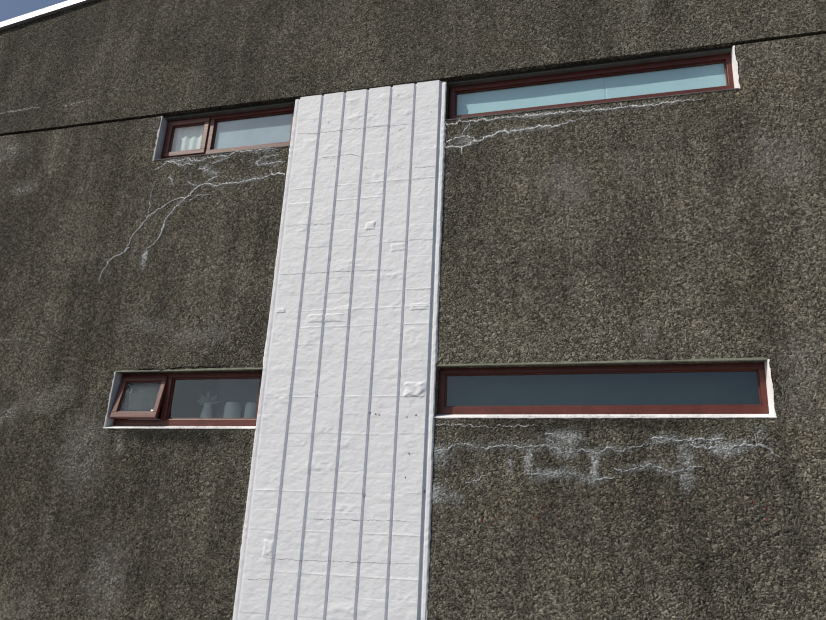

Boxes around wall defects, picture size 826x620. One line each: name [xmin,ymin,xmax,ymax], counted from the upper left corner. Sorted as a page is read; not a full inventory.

crack [446,99,702,155]
crack [98,146,285,282]
crack [435,424,780,483]